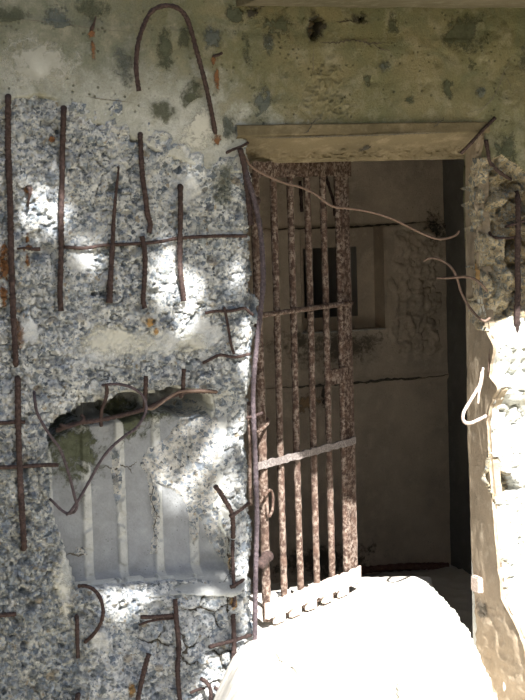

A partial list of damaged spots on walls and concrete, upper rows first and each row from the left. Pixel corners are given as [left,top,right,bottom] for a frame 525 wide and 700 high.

damp [307,12,327,39]
spalling [460,116,525,333]
corrosion [0,244,9,307]
spalling [0,94,263,700]
damp [47,409,102,489]
crack [137,633,231,687]